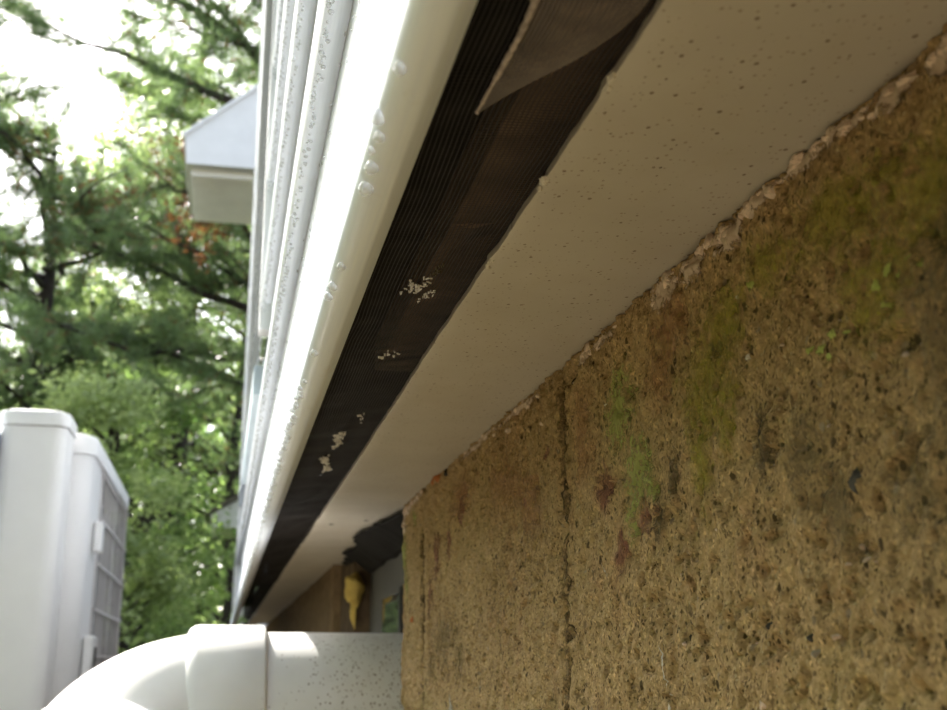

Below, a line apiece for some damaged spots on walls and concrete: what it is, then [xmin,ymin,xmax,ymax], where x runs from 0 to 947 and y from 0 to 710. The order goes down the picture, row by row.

crack [418,534,426,704]
crack [556,388,577,710]
damp [625,447,682,552]